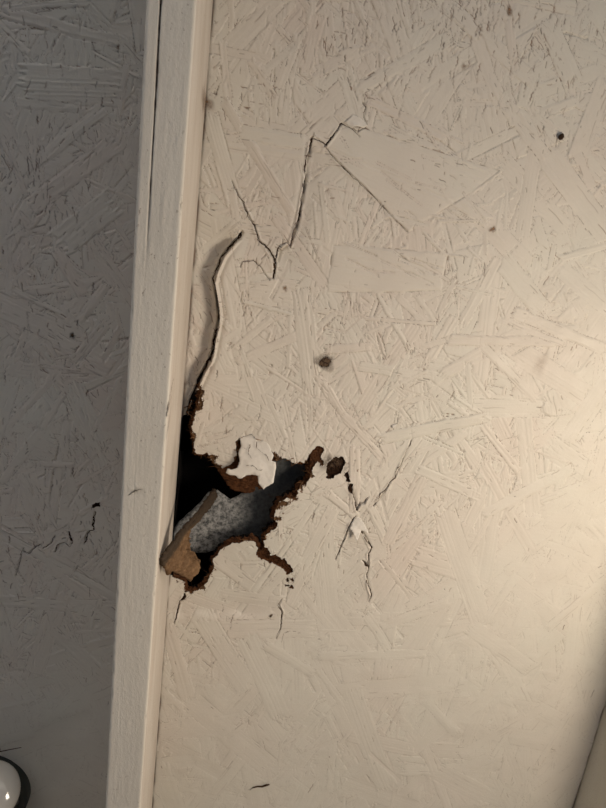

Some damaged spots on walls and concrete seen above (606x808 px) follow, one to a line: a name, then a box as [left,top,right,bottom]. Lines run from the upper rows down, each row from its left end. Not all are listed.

crack [199,106,408,376]
spalling [171,372,312,592]
crack [335,442,411,596]